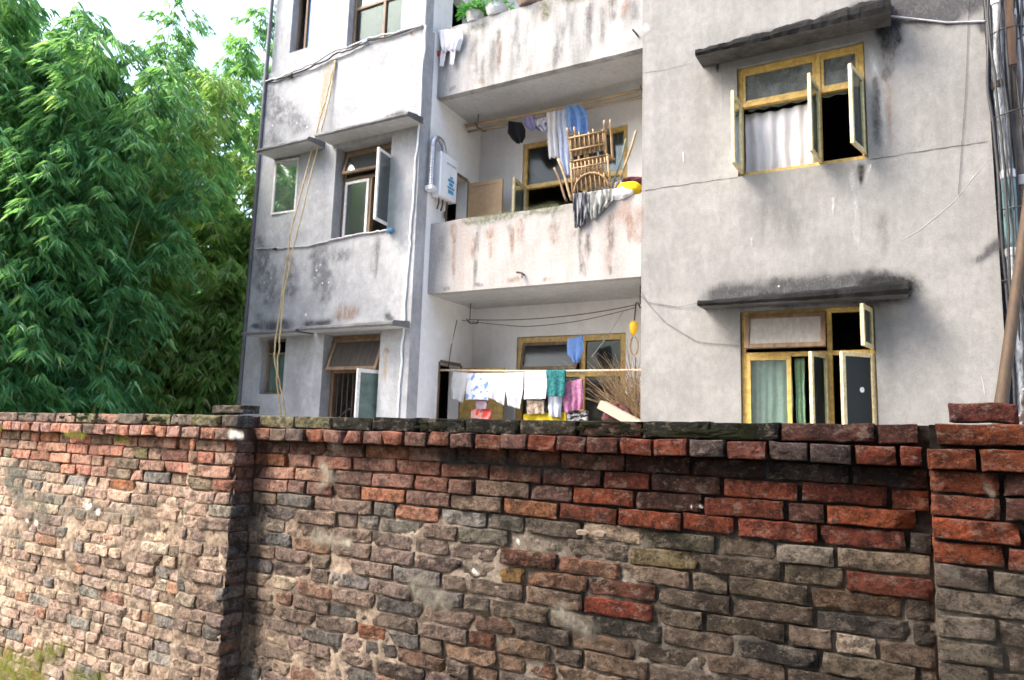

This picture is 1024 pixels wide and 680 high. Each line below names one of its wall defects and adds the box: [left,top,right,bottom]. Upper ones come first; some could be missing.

leakage [870,0,992,138]
leakage [310,250,347,301]
leakage [708,270,915,308]